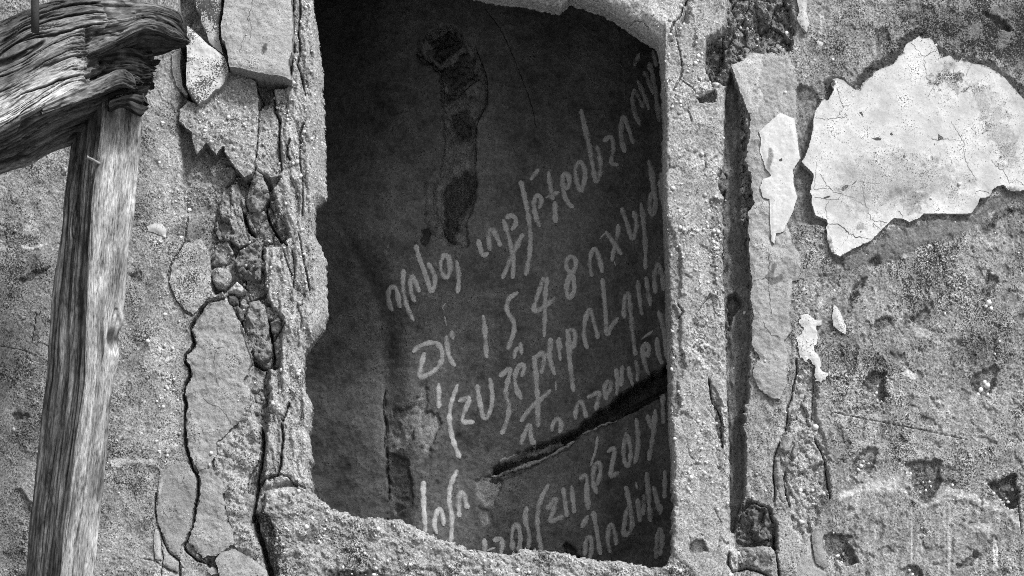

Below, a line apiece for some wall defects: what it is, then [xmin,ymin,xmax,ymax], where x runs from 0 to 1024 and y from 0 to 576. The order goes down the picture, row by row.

flaking render [172,0,295,185]
crack [297,0,306,95]
spalling [874,28,889,47]
flaking render [697,36,1024,402]
crack [149,86,310,576]
crack [772,359,961,506]